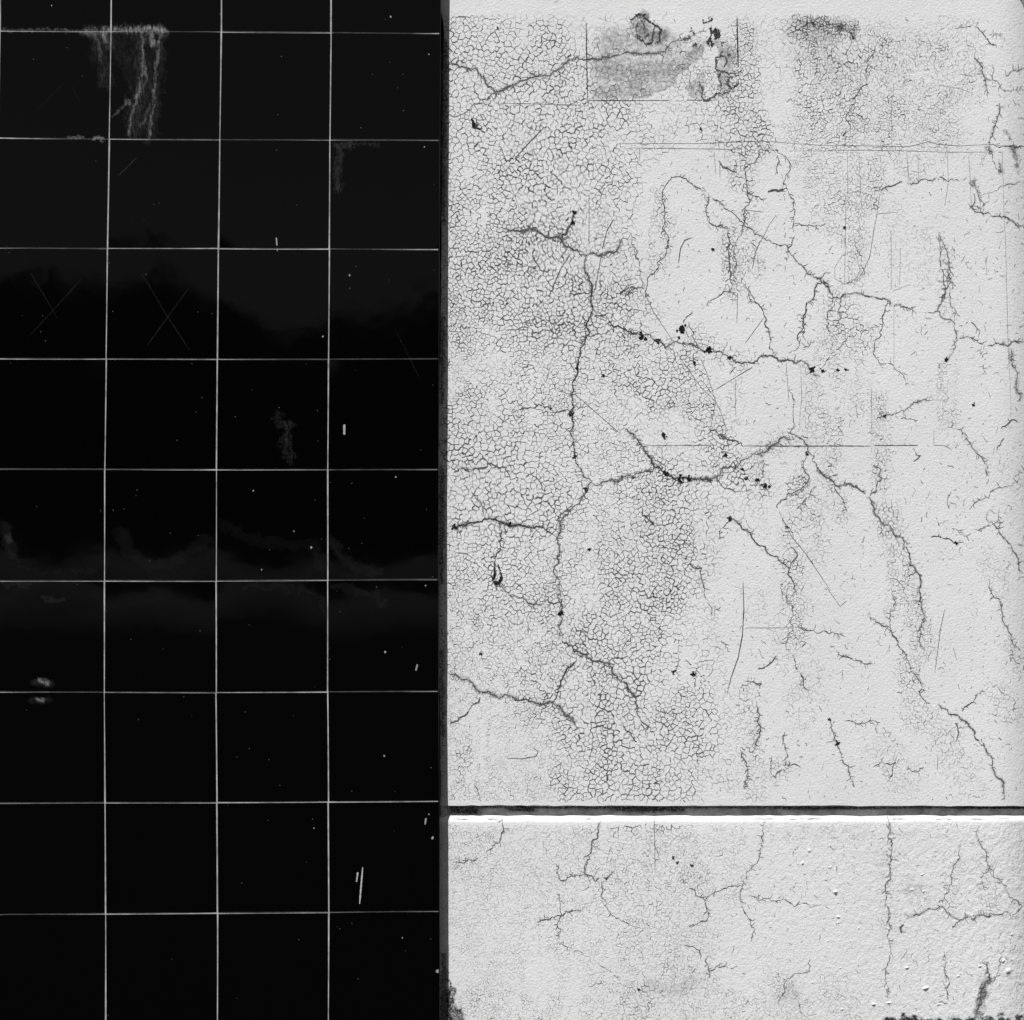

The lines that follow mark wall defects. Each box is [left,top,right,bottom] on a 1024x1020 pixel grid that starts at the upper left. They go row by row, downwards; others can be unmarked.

crack [439,12,1024,1020]